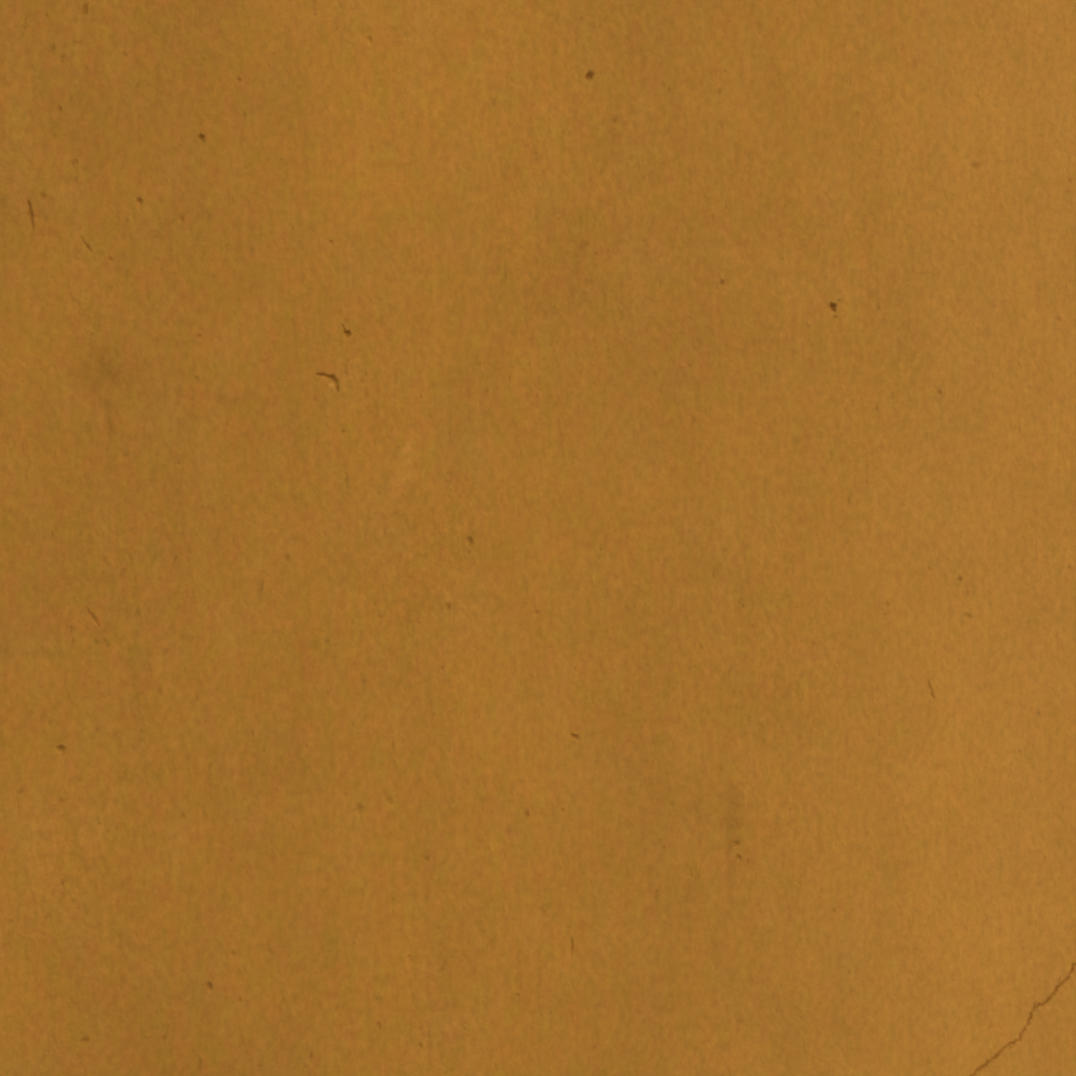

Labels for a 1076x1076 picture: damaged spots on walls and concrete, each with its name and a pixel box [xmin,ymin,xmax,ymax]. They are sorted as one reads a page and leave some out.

crack [969,962,1076,1076]